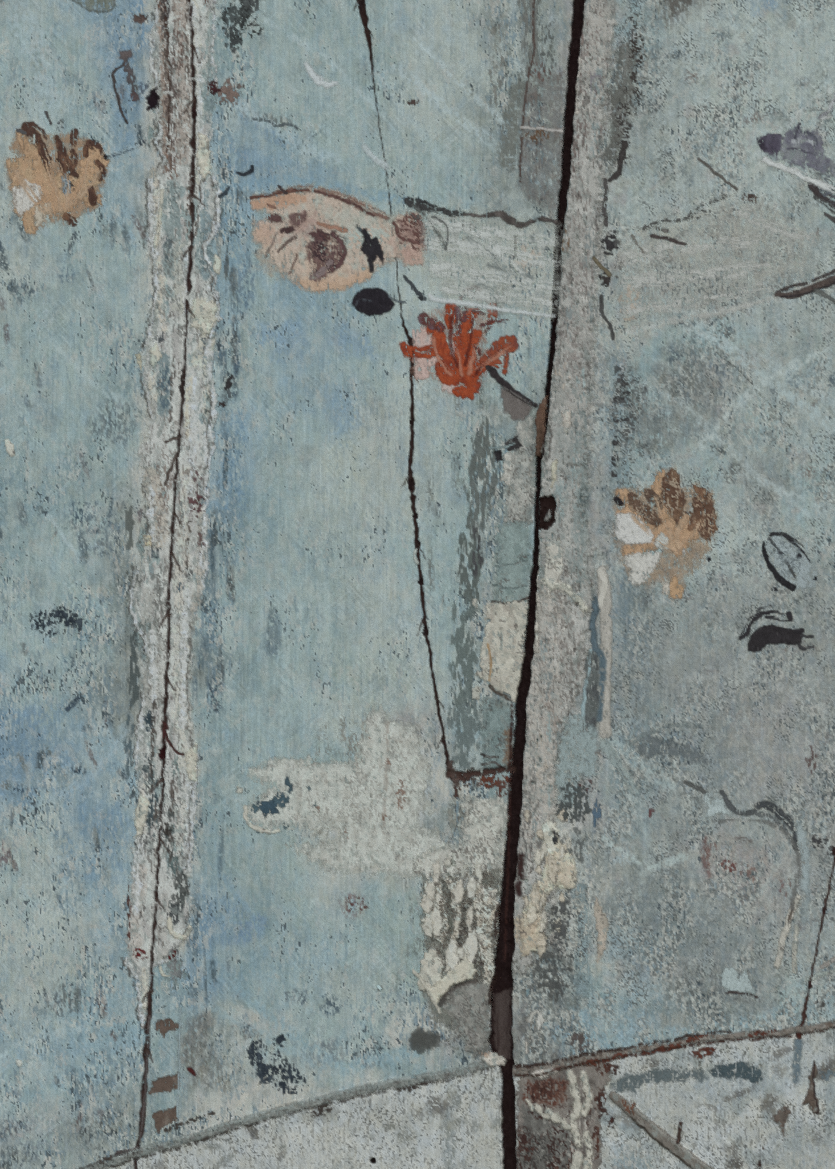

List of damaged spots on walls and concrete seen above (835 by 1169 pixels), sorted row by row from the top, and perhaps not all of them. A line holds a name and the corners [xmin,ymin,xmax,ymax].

crack [163,0,171,150]
crack [183,0,205,292]
crack [355,0,391,212]
crack [401,315,414,347]
peeling [123,0,223,1029]
crack [155,300,193,819]
peeling [237,0,645,1054]
crack [407,0,835,1169]
crack [154,823,171,906]
crack [79,906,506,1169]
corrosion [515,1061,619,1169]